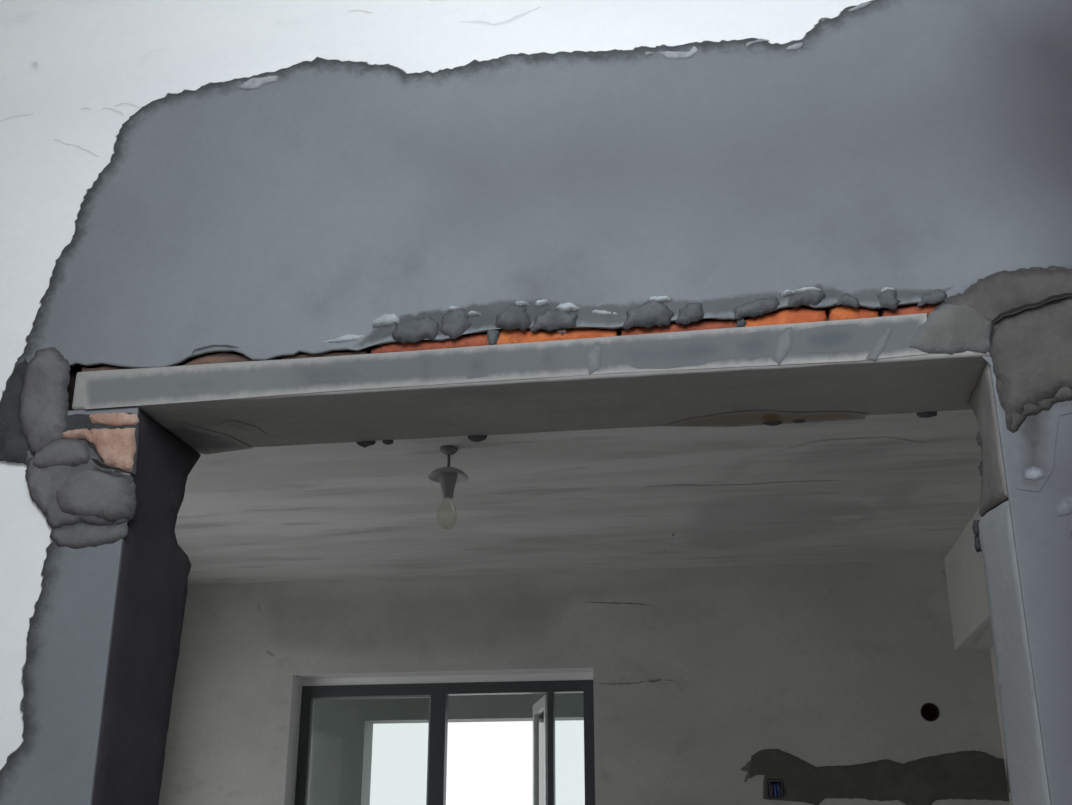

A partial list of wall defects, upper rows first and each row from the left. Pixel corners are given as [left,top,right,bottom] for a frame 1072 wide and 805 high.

spalling [280,282,957,360]
spalling [180,352,254,366]
flaking render [62,412,139,475]